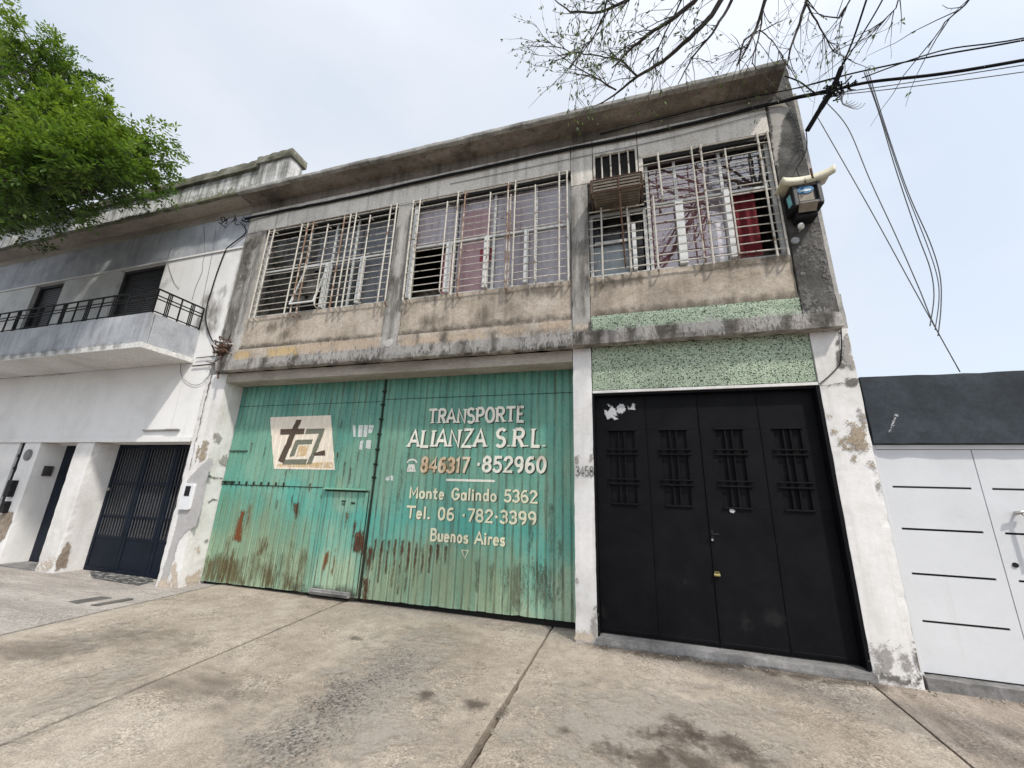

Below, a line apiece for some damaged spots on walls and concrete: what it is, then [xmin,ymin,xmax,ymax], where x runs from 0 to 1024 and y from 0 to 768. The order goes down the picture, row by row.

water stain [398,312,511,354]
water stain [569,307,668,345]
peeling [604,403,636,420]
peeling [195,432,228,466]
peeling [826,408,882,492]
peeling [157,563,201,588]
rust [204,506,307,591]
rust [345,513,448,600]
peeling [880,641,922,686]